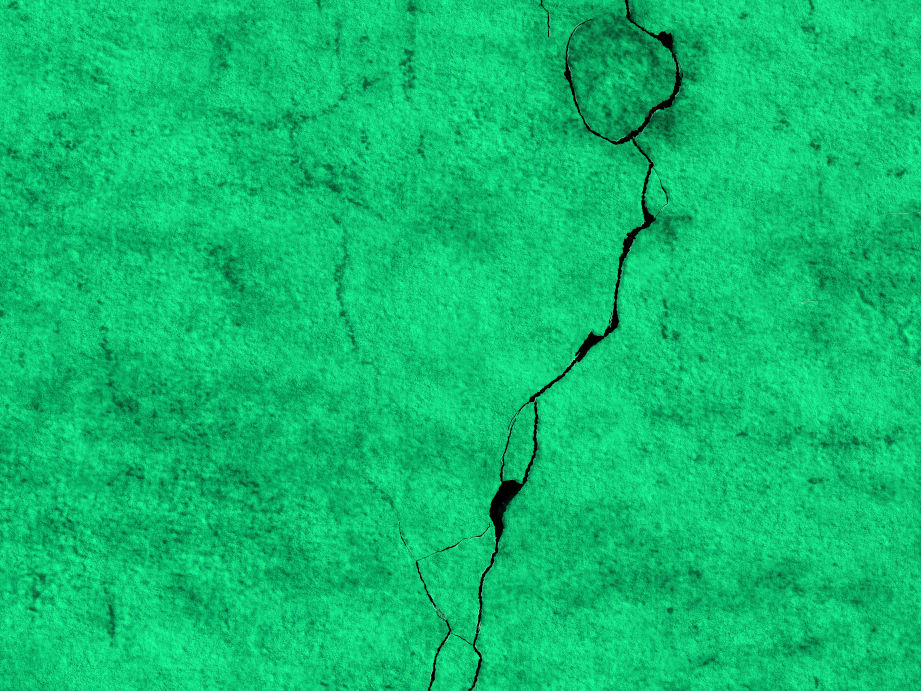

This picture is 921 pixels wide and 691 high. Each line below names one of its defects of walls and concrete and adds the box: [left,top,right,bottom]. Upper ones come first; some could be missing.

crack [540,0,684,339]
crack [499,355,578,485]
crack [397,518,500,691]